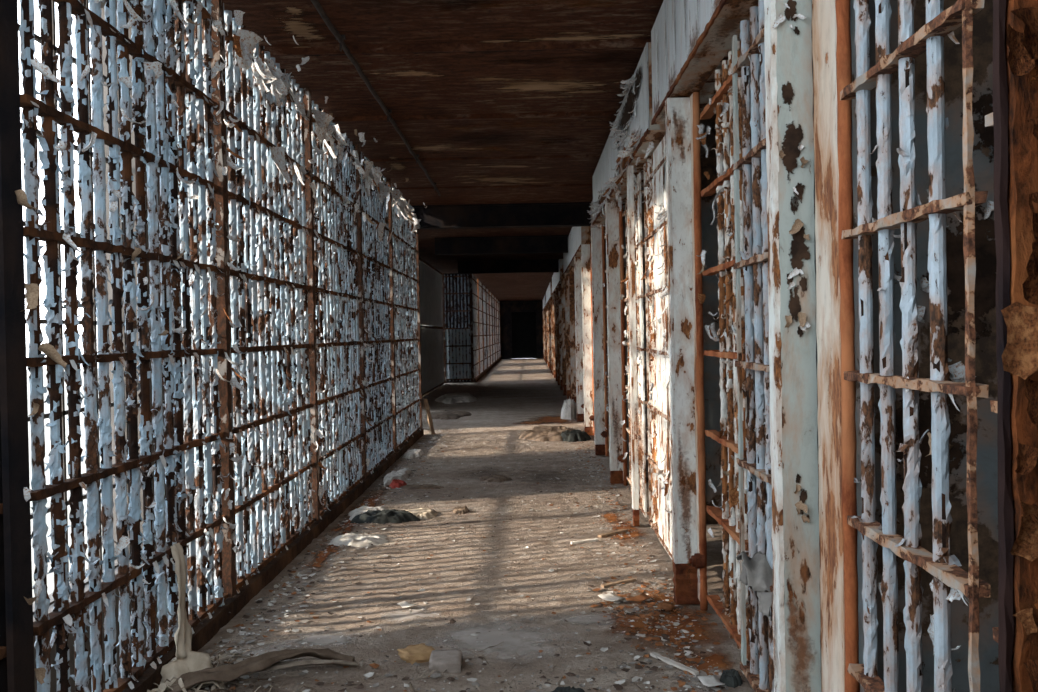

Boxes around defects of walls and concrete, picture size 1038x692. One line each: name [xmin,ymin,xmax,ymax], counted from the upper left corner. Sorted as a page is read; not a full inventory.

peeling [119,0,145,28]
peeling [772,0,807,35]
peeling [30,57,62,83]
peeling [143,62,163,82]
peeling [166,0,477,242]
peeling [779,81,811,338]
peeling [62,233,83,262]
peeling [20,283,40,312]
peeling [216,344,247,393]
peeling [224,432,246,463]
peeling [211,475,239,553]
peeling [115,536,130,555]